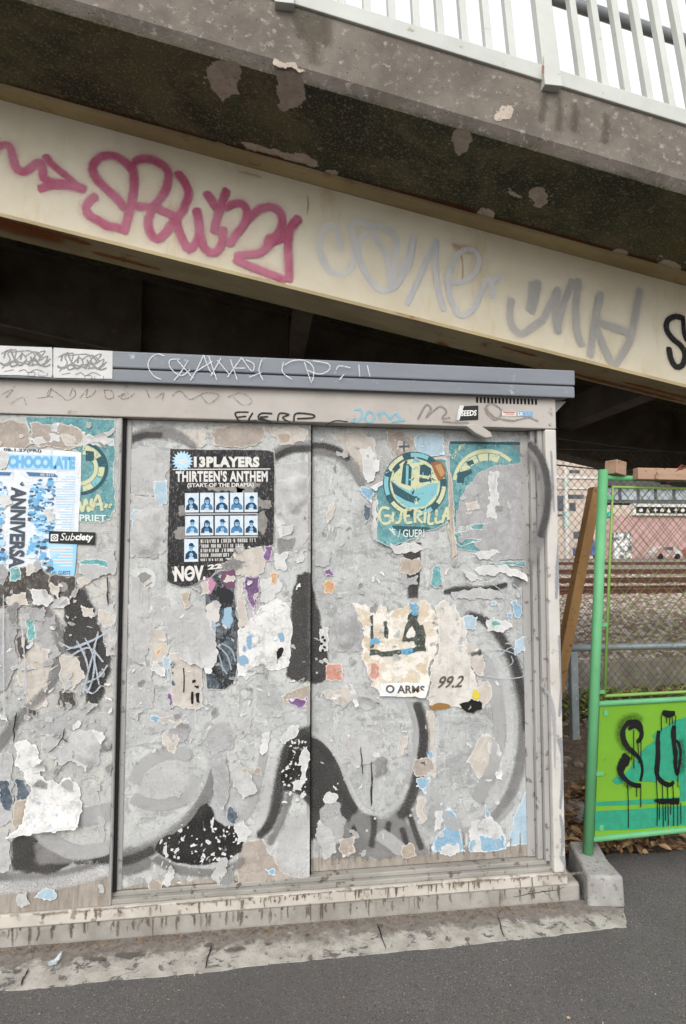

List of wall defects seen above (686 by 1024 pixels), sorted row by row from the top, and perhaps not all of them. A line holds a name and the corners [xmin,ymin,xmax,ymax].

spalling [203,60,242,102]
spalling [273,58,311,112]
spalling [494,105,518,121]
spalling [241,141,338,175]
spalling [448,128,473,156]
spalling [508,187,553,208]
peeling [130,421,308,554]
peeling [321,430,451,541]
peeling [0,456,529,894]
peeling [16,888,57,908]